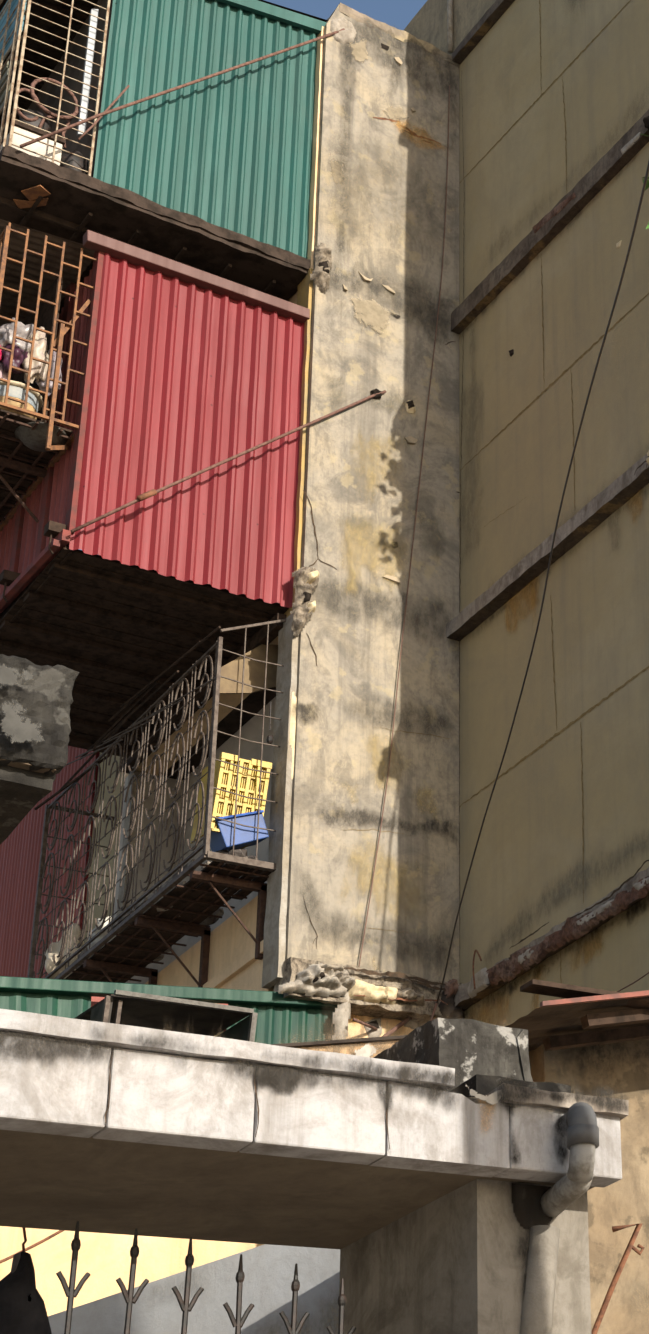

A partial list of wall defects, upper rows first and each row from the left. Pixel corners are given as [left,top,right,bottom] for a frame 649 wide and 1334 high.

leakage [343,25,449,112]
leakage [352,275,447,339]
peeling [0,663,44,743]
leakage [298,704,315,723]
leakage [322,794,454,839]
spalling [297,876,649,1019]
leakage [0,1030,111,1060]
leakage [229,1033,458,1109]